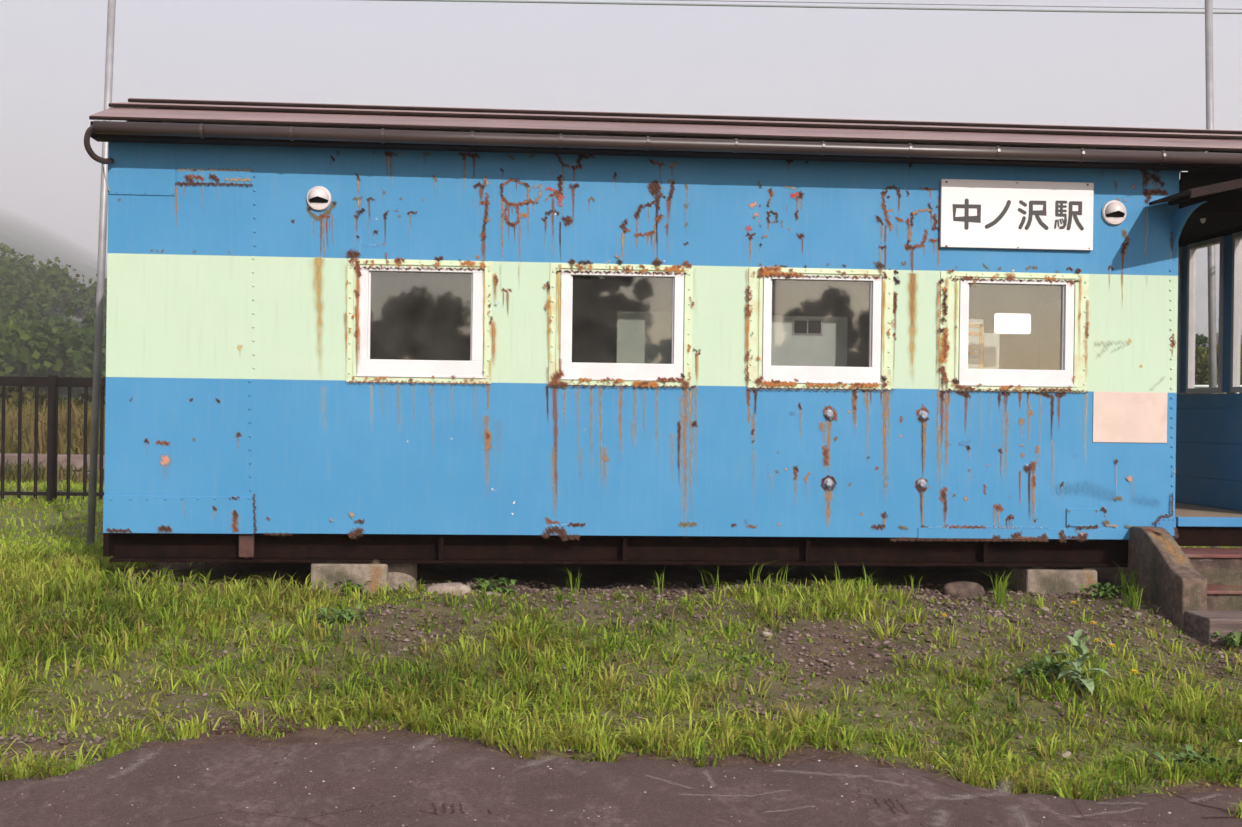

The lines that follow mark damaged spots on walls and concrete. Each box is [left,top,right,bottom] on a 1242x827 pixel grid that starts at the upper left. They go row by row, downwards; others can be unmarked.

corrosion [175,168,252,215]
corrosion [306,202,337,341]
corrosion [345,152,700,494]
corrosion [745,185,1098,542]
corrosion [1121,229,1130,298]
corrosion [541,517,586,540]